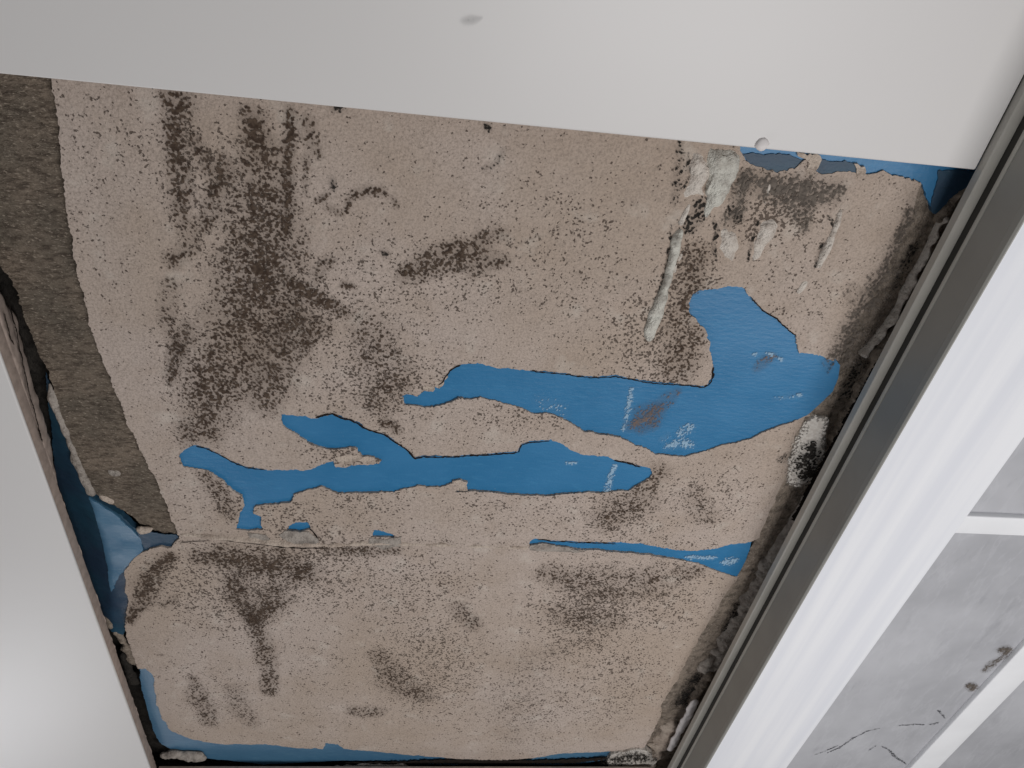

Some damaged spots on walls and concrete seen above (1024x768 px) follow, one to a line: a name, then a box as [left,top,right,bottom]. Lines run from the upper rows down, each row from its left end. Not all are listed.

damp [156,91,414,448]
damp [379,226,511,286]
damp [722,168,847,234]
peeling [740,146,982,214]
damp [124,543,326,697]
spalling [0,73,470,766]
damp [320,546,400,558]
peeling [179,413,652,544]
peeling [403,286,840,456]
damp [584,464,671,531]
peeling [529,539,751,576]
damp [602,186,961,768]